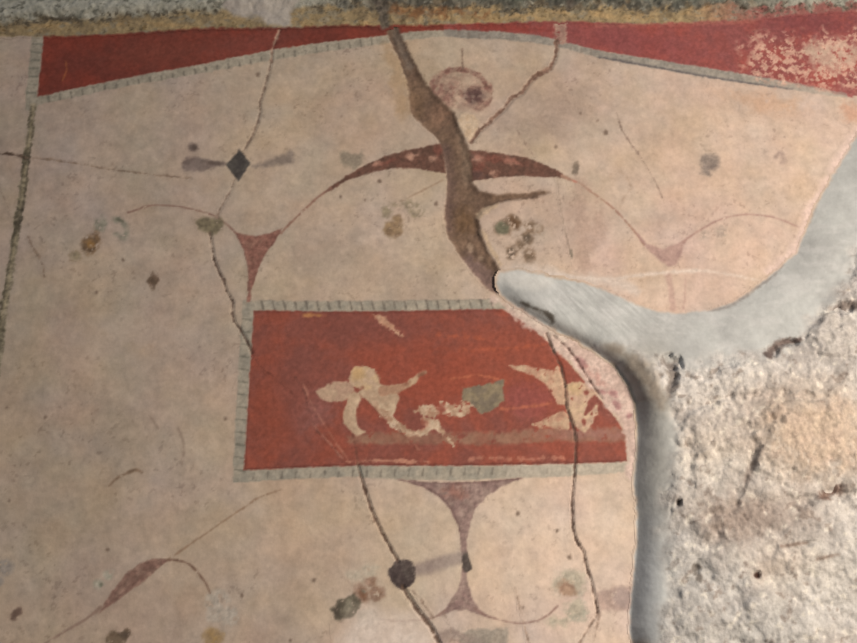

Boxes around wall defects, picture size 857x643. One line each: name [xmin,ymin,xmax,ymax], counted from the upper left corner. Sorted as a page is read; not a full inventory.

crack [0,151,193,180]
crack [243,29,283,151]
crack [370,0,575,296]
peeling [730,19,857,103]
crack [26,235,47,280]
crack [207,178,295,397]
crack [355,466,453,643]
crack [512,586,532,643]
flaking render [488,293,636,484]
crack [544,332,604,643]
flaking render [655,247,857,643]